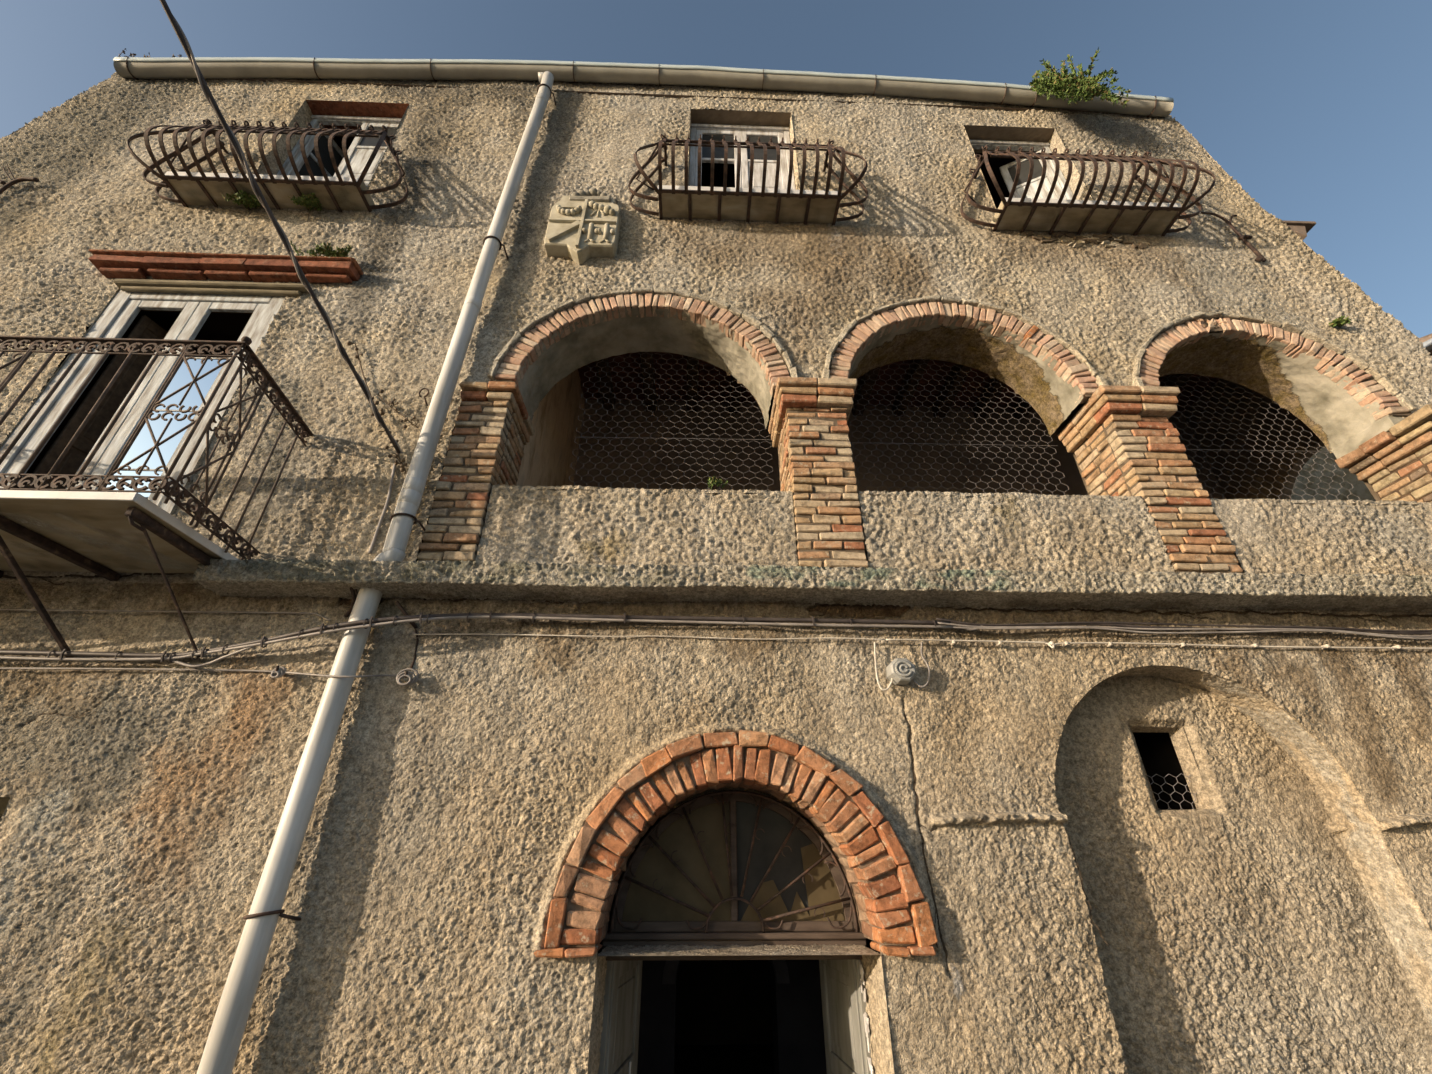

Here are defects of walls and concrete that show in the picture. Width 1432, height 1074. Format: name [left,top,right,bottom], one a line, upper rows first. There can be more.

crack [903,704,949,972]